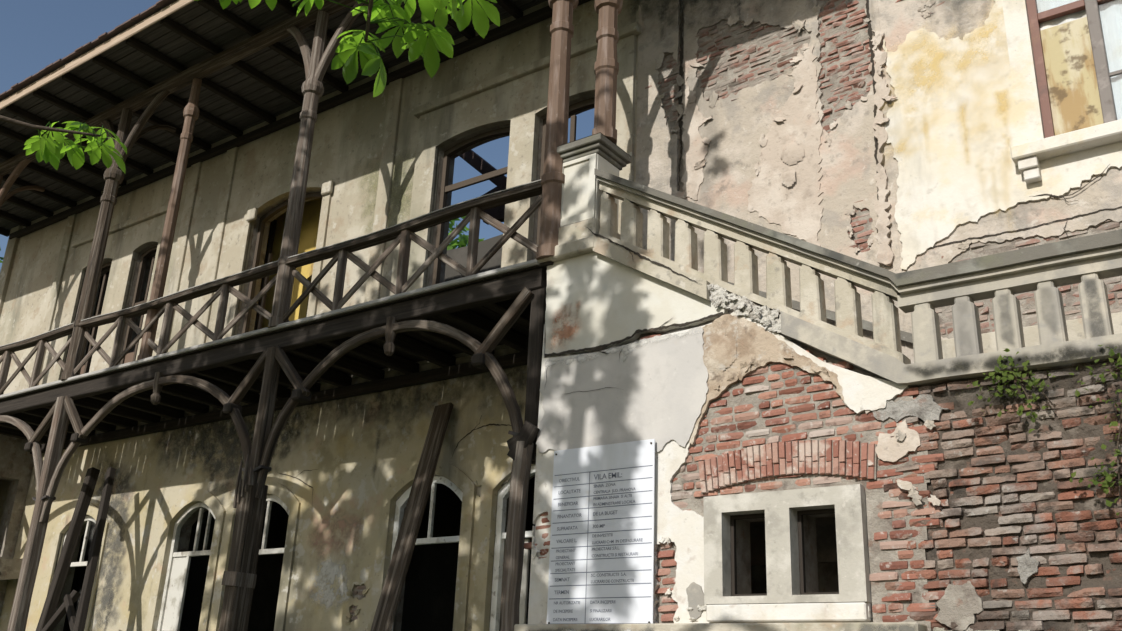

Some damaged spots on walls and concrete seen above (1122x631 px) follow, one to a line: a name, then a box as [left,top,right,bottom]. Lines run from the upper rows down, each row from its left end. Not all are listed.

flaking render [645,0,897,266]
spalling [941,219,1122,263]
corrosion [553,317,577,340]
crack [544,312,723,394]
spalling [935,305,954,339]
spalling [974,298,995,334]
spalling [1101,276,1122,313]
water stain [158,414,255,486]
spalling [671,350,1122,631]
water stain [92,464,130,626]
spalling [524,512,551,559]
spalling [654,537,706,623]